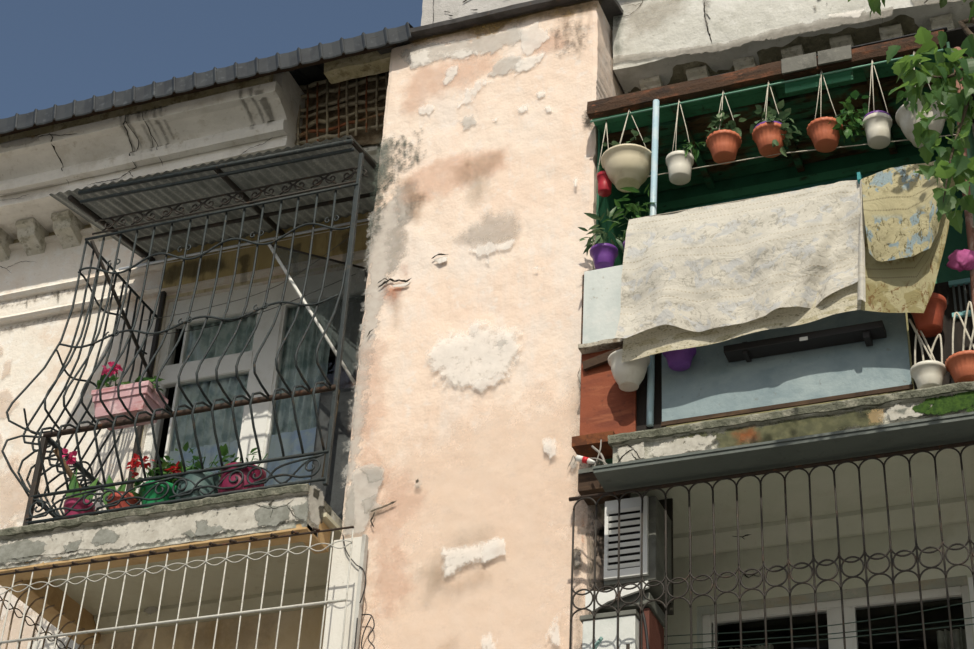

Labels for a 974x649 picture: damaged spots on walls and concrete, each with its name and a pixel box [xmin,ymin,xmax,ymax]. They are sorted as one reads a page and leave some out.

crack [703,2,712,42]
peeling [401,23,549,69]
water stain [367,130,423,251]
spalling [473,239,514,256]
flaking render [342,182,417,535]
peeling [887,403,932,420]
peeling [617,434,716,462]
peeling [0,486,325,566]
peeling [0,585,32,619]